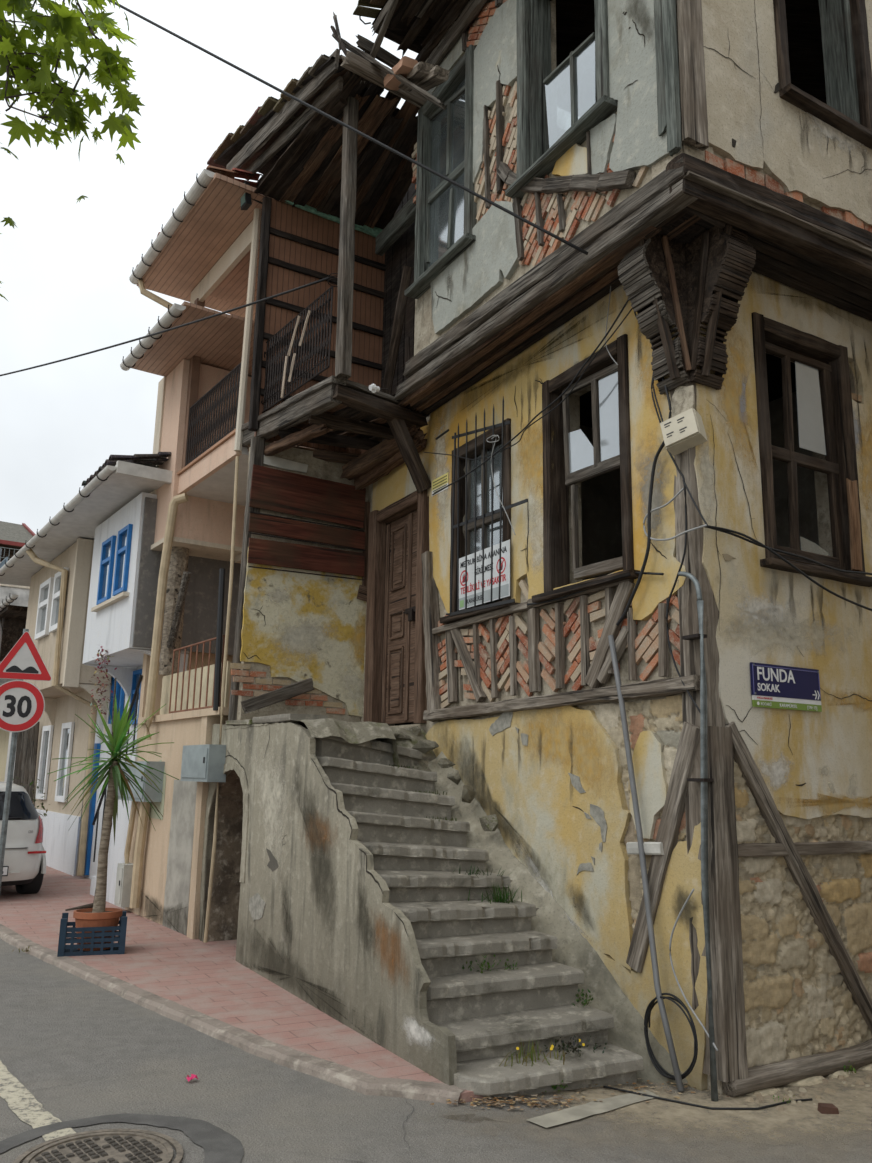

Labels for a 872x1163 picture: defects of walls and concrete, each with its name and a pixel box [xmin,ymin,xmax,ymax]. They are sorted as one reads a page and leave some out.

spalling [466,0,507,47]
spalling [474,81,649,266]
spalling [705,138,803,202]
crack [823,136,872,179]
spalling [821,206,872,232]
spalling [231,663,346,715]
damp [256,759,285,853]
peeling [803,767,872,814]
damp [303,801,332,911]
damp [358,893,400,975]
damp [263,945,341,1015]
damp [405,1018,431,1043]